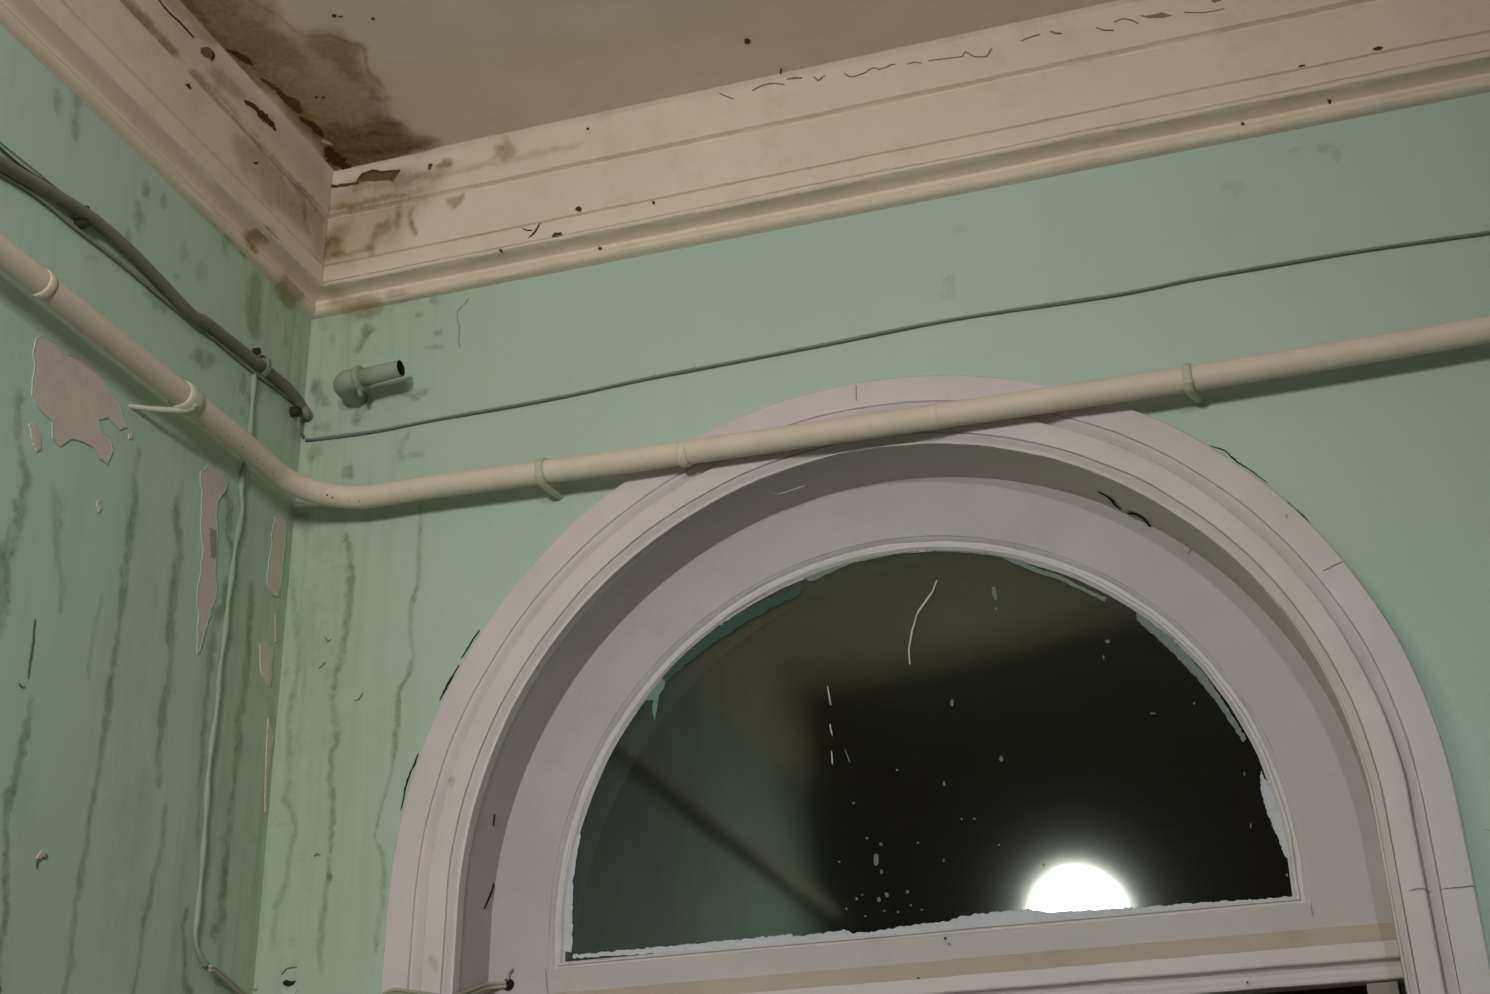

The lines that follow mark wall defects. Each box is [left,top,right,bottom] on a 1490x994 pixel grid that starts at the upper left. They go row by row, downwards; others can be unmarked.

peeling [1113,0,1225,24]
peeling [29,335,133,464]
peeling [196,464,228,654]